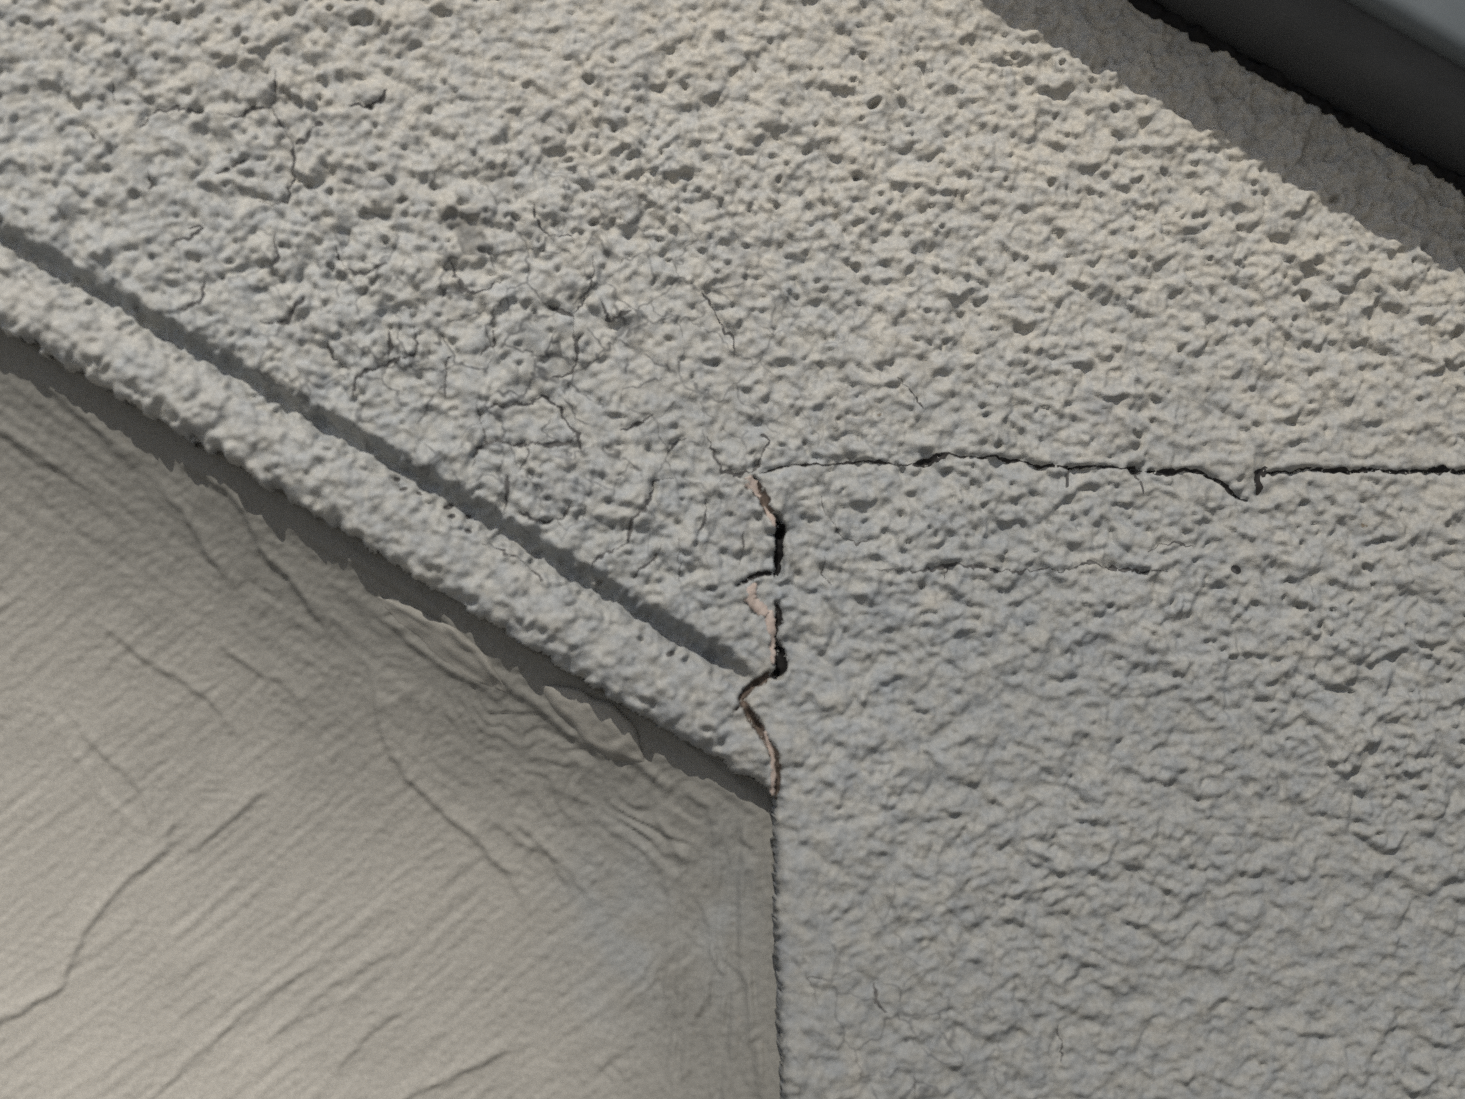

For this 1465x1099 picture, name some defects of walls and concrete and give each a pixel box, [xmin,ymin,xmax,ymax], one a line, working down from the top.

crack [348,88,387,108]
crack [112,69,315,271]
crack [178,280,205,310]
crack [260,296,304,325]
crack [701,291,735,357]
crack [327,206,631,524]
crack [620,414,653,430]
crack [482,543,544,581]
crack [591,434,1465,799]